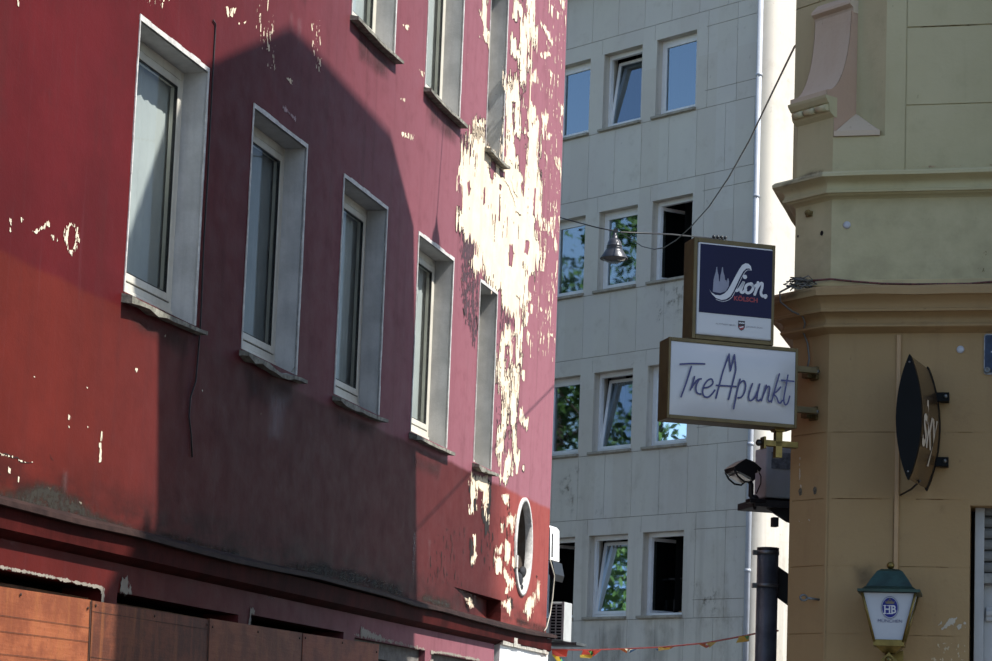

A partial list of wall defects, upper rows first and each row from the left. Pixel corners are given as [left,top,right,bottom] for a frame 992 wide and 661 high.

peeling [226,0,276,70]
peeling [456,0,566,619]